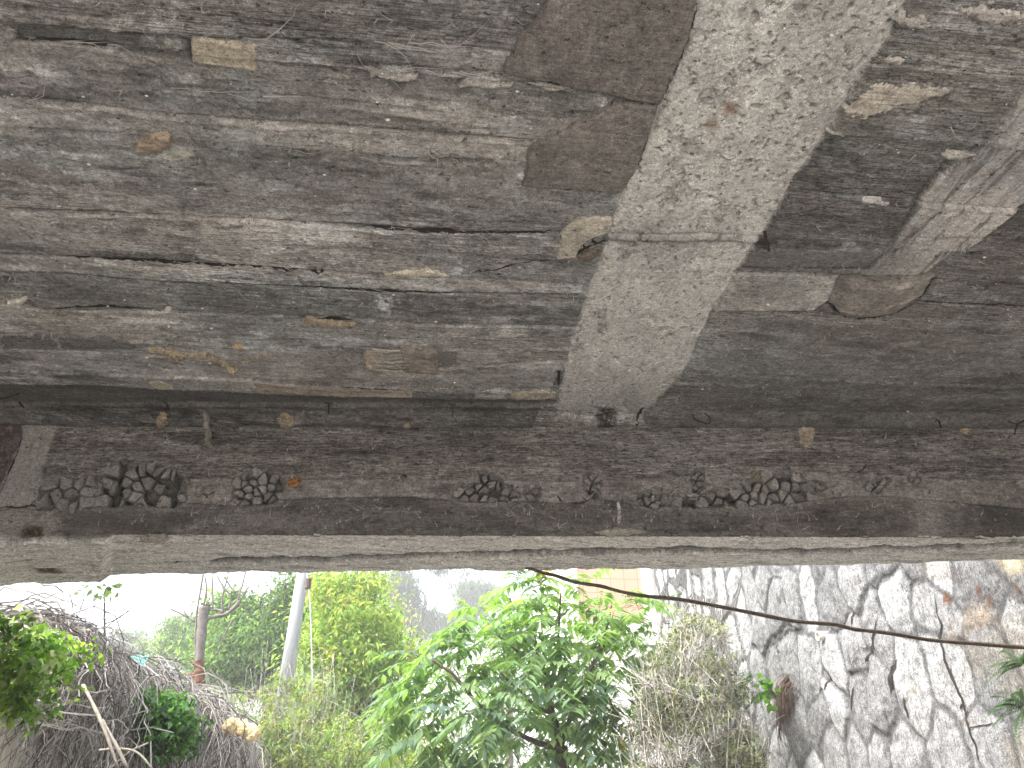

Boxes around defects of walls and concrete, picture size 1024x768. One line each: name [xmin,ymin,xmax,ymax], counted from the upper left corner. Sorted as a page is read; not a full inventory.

spalling [840,82,951,120]
crack [359,225,552,234]
spalling [557,216,612,259]
crack [575,239,609,258]
crack [57,254,546,293]